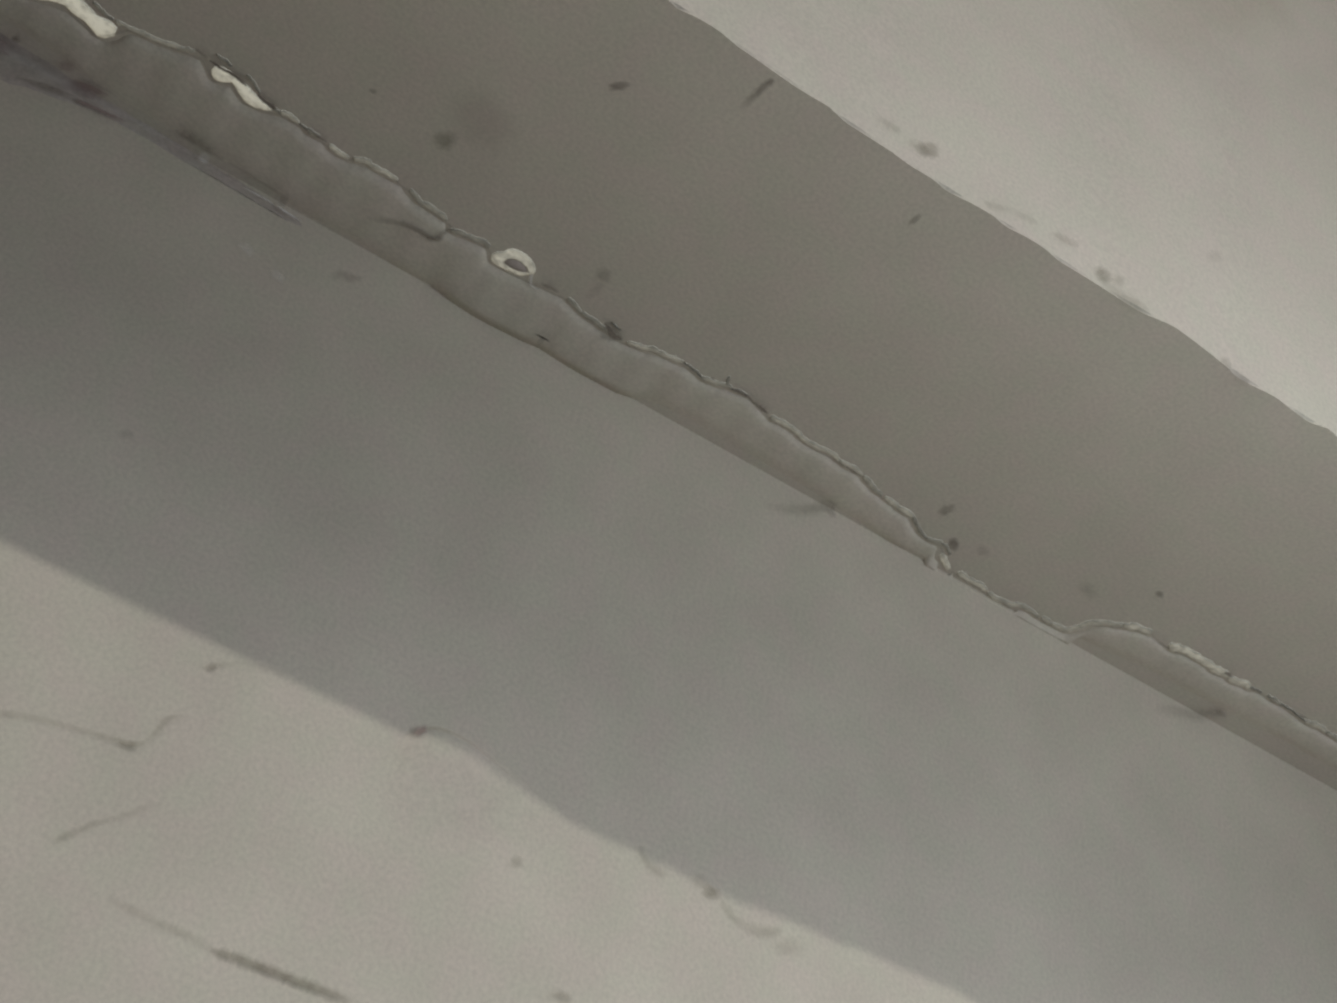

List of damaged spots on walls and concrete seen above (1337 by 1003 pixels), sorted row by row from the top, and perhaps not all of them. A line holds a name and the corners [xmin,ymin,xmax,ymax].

crack [46,0,491,248]
crack [544,285,1337,741]